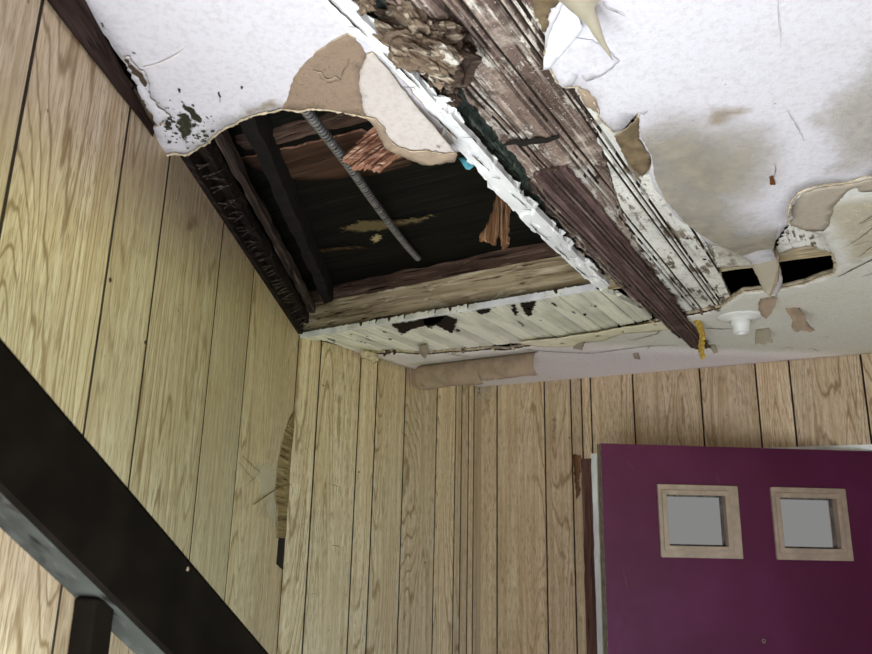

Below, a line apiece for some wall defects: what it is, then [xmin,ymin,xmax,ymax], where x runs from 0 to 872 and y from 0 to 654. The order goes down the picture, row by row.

peeling [559,0,613,60]
peeling [123,56,171,127]
water stain [164,88,221,149]
peeling [283,33,366,119]
water stain [646,133,777,256]
peeling [790,179,872,232]
peeling [424,316,460,333]
peeling [376,320,669,359]
peeling [511,301,542,327]
spalling [683,289,763,323]